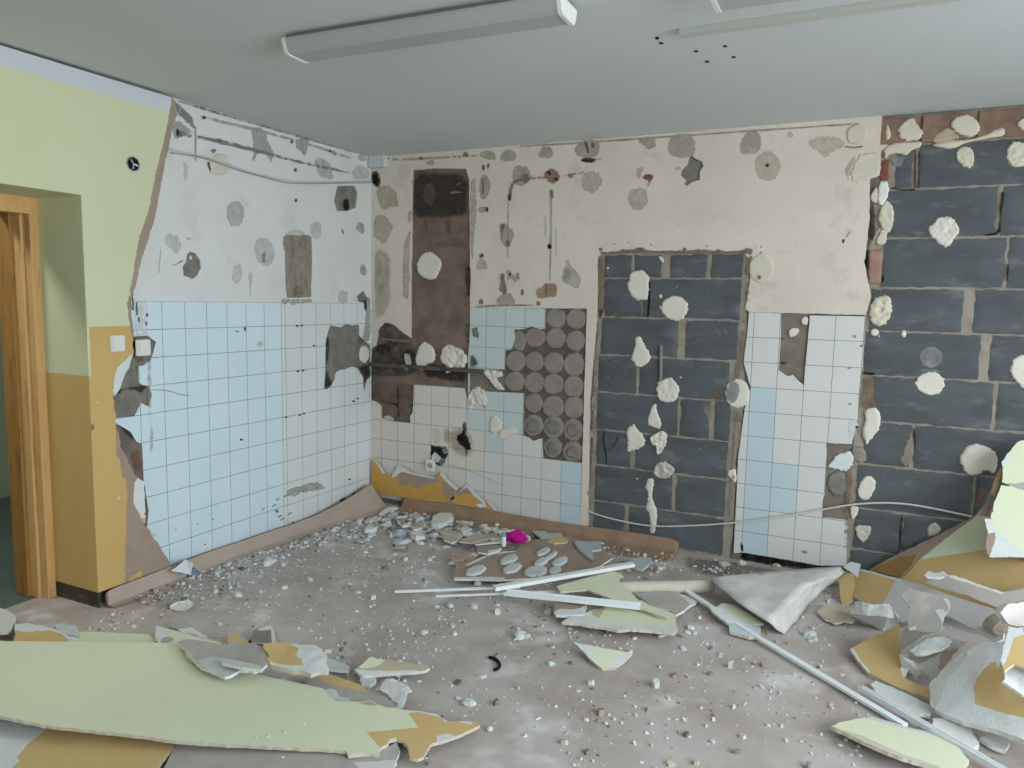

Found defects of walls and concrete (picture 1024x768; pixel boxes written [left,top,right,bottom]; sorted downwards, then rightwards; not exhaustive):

flaking render [227,201,244,226]
flaking render [252,128,273,162]
peeling [255,222,321,305]
spalling [291,138,381,211]
flaking render [478,150,516,213]
flaking render [500,223,514,247]
peeling [864,125,1005,283]
peeling [112,97,199,582]
peeling [313,291,416,422]
peeling [467,242,762,462]
peeling [779,313,810,383]
spalling [862,377,876,409]